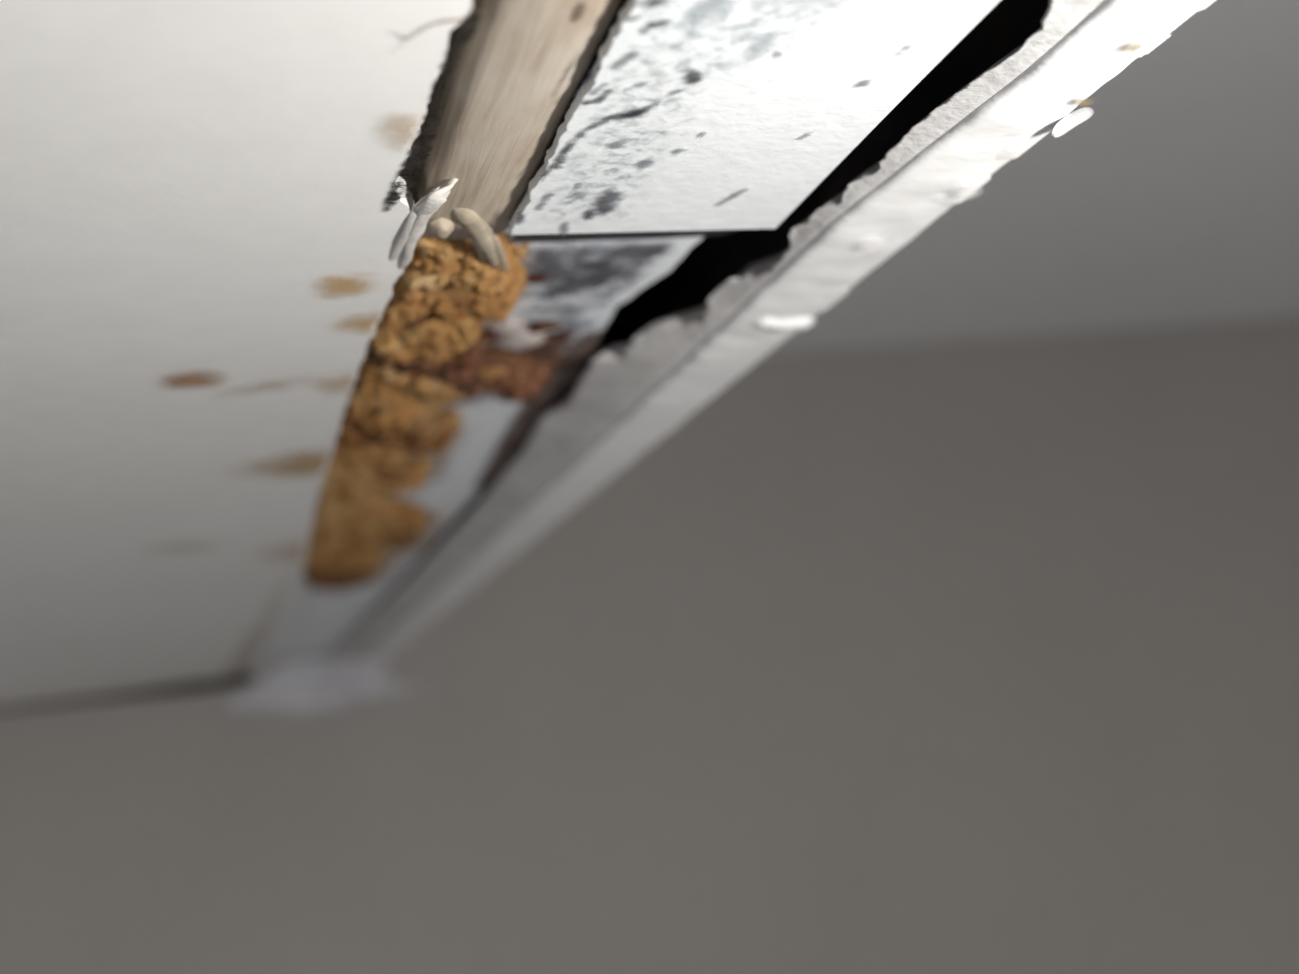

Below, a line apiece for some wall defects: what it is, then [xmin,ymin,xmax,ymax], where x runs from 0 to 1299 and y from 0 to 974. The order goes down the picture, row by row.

rust [168,375,218,387]
rust [327,279,364,294]
rust [365,321,601,489]
water stain [511,229,742,346]
spalling [332,0,1104,660]